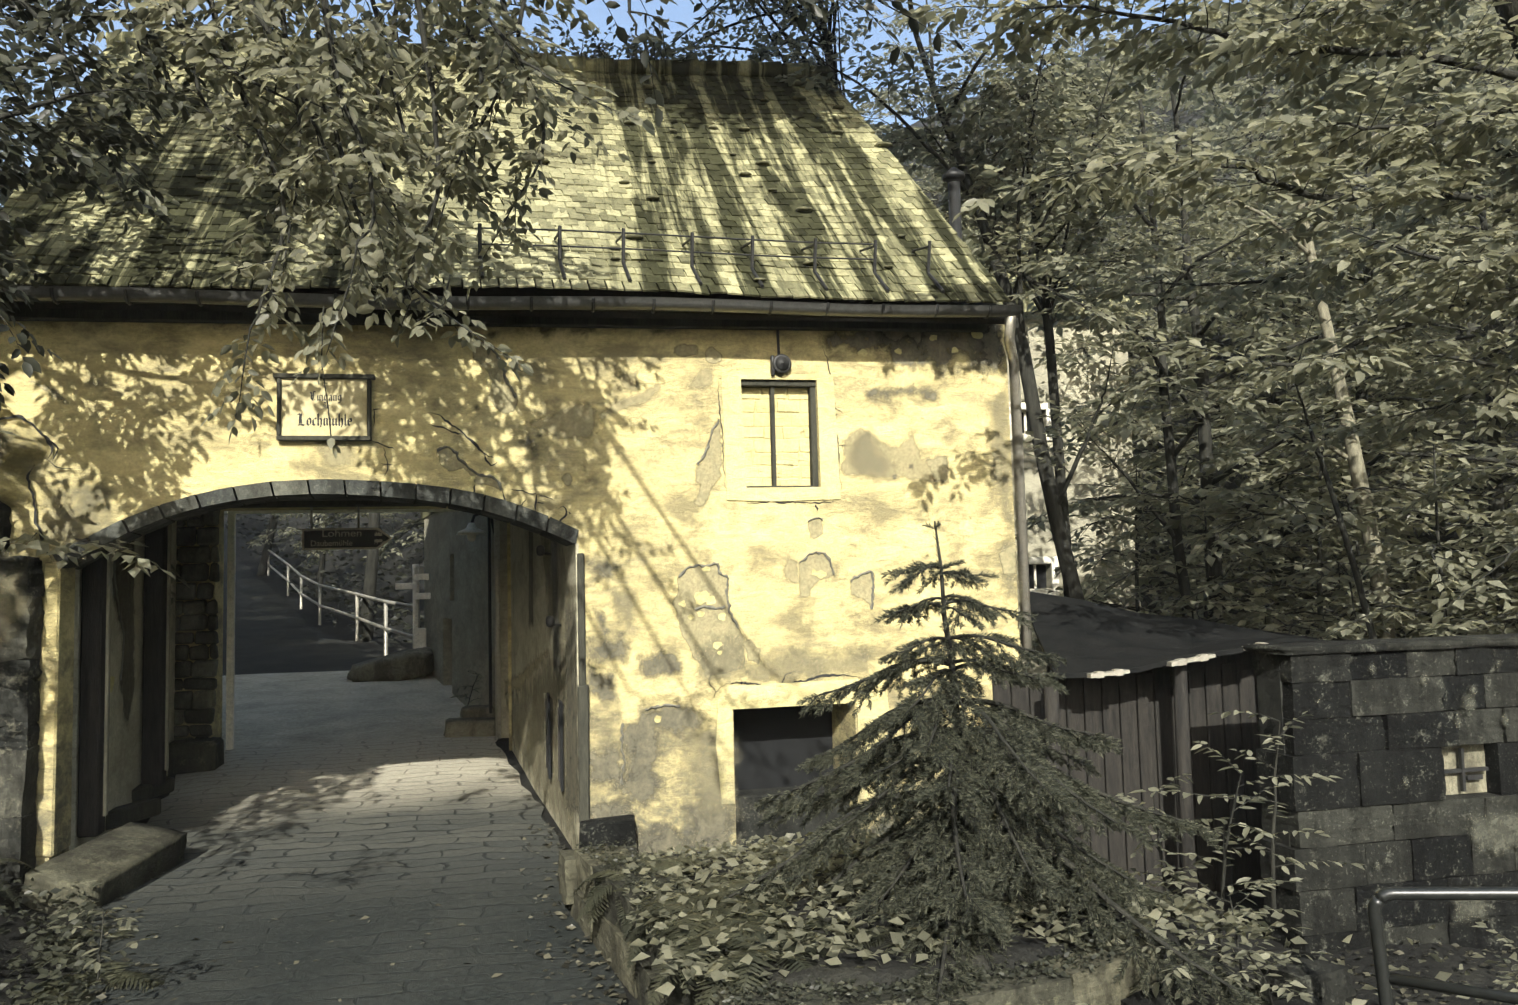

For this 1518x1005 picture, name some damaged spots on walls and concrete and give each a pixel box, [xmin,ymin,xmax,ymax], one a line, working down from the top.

crack [0,414,75,557]
crack [373,408,395,474]
flaking render [467,332,518,414]
crack [430,412,571,522]
flaking render [519,372,660,452]
flaking render [695,419,722,506]
flaking render [841,428,948,483]
flaking render [784,517,875,609]
flaking render [586,561,760,679]